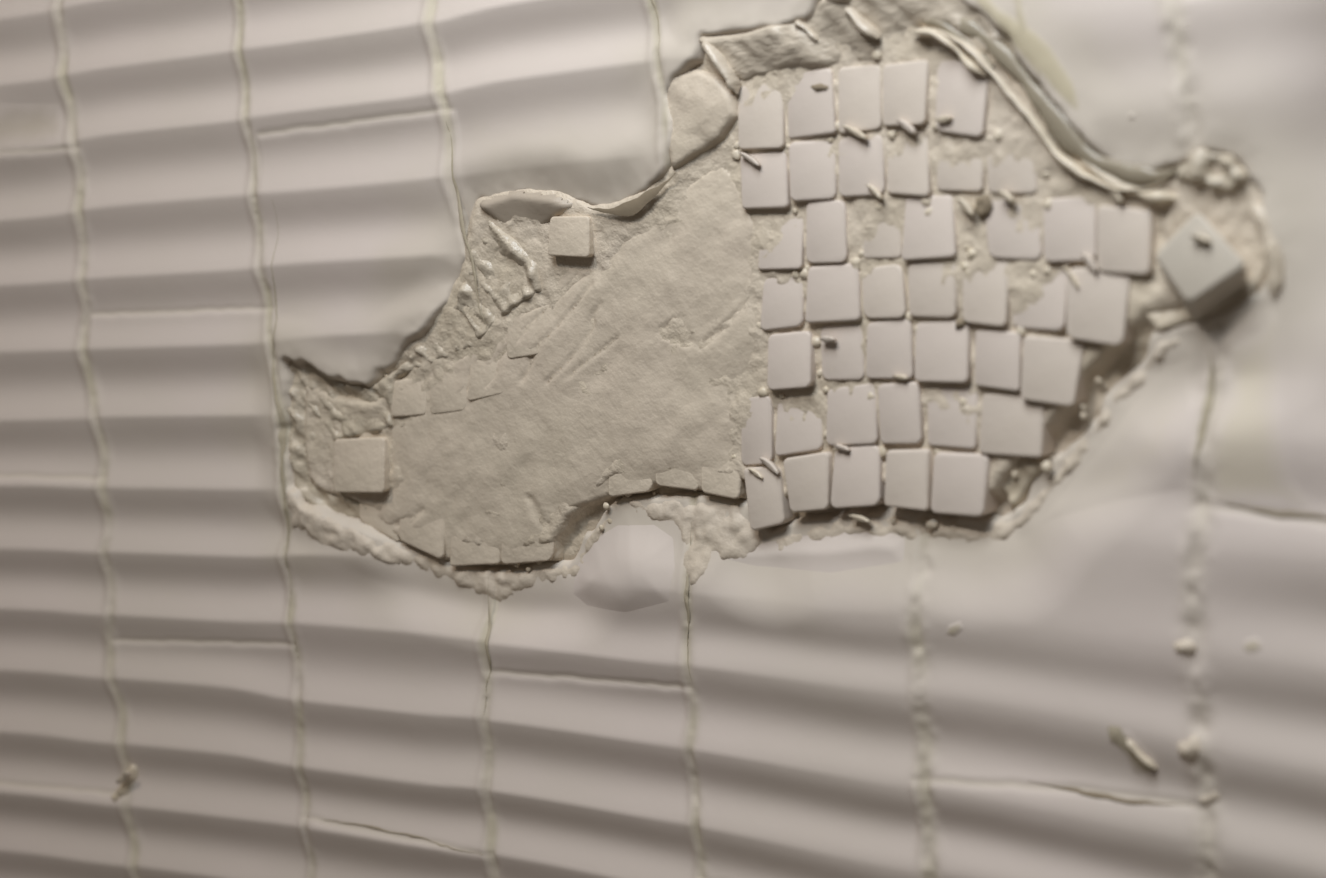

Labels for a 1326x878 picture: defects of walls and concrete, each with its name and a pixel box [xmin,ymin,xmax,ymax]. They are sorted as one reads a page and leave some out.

spalling [287,0,1284,602]
crack [1029,781,1183,805]
crack [307,816,482,855]